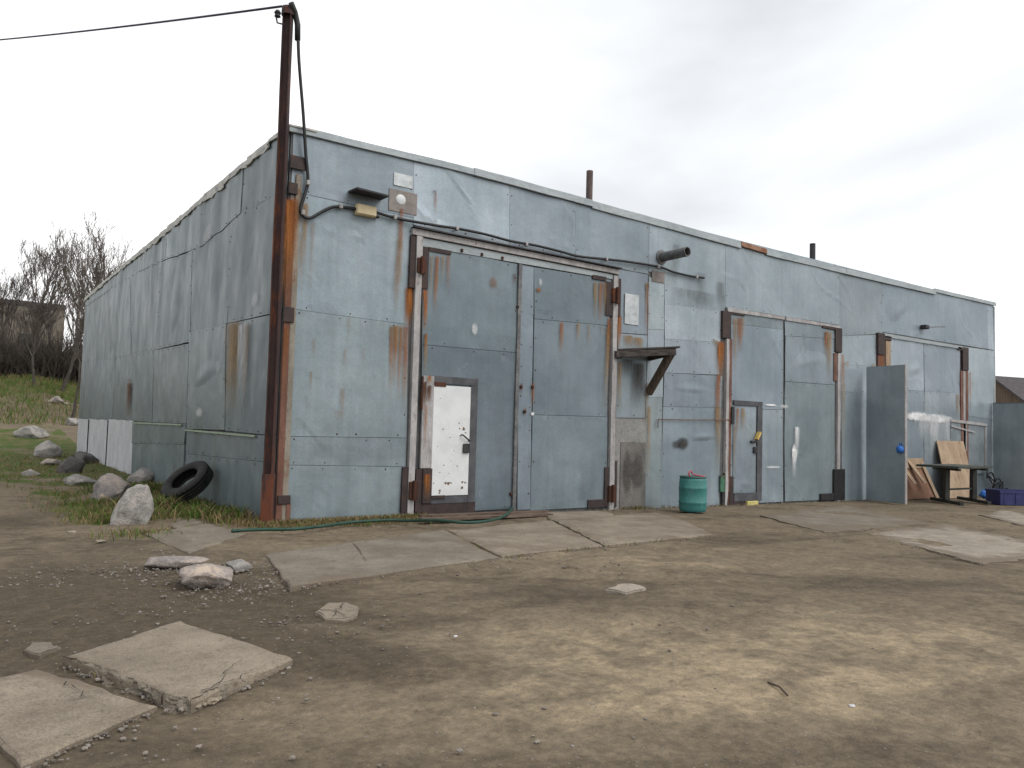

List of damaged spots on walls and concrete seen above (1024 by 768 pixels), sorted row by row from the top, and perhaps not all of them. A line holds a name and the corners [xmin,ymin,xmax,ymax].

corrosion [284,198,308,266]
corrosion [390,257,443,364]
corrosion [716,340,724,436]
leakage [624,458,643,491]
crack [203,660,255,690]